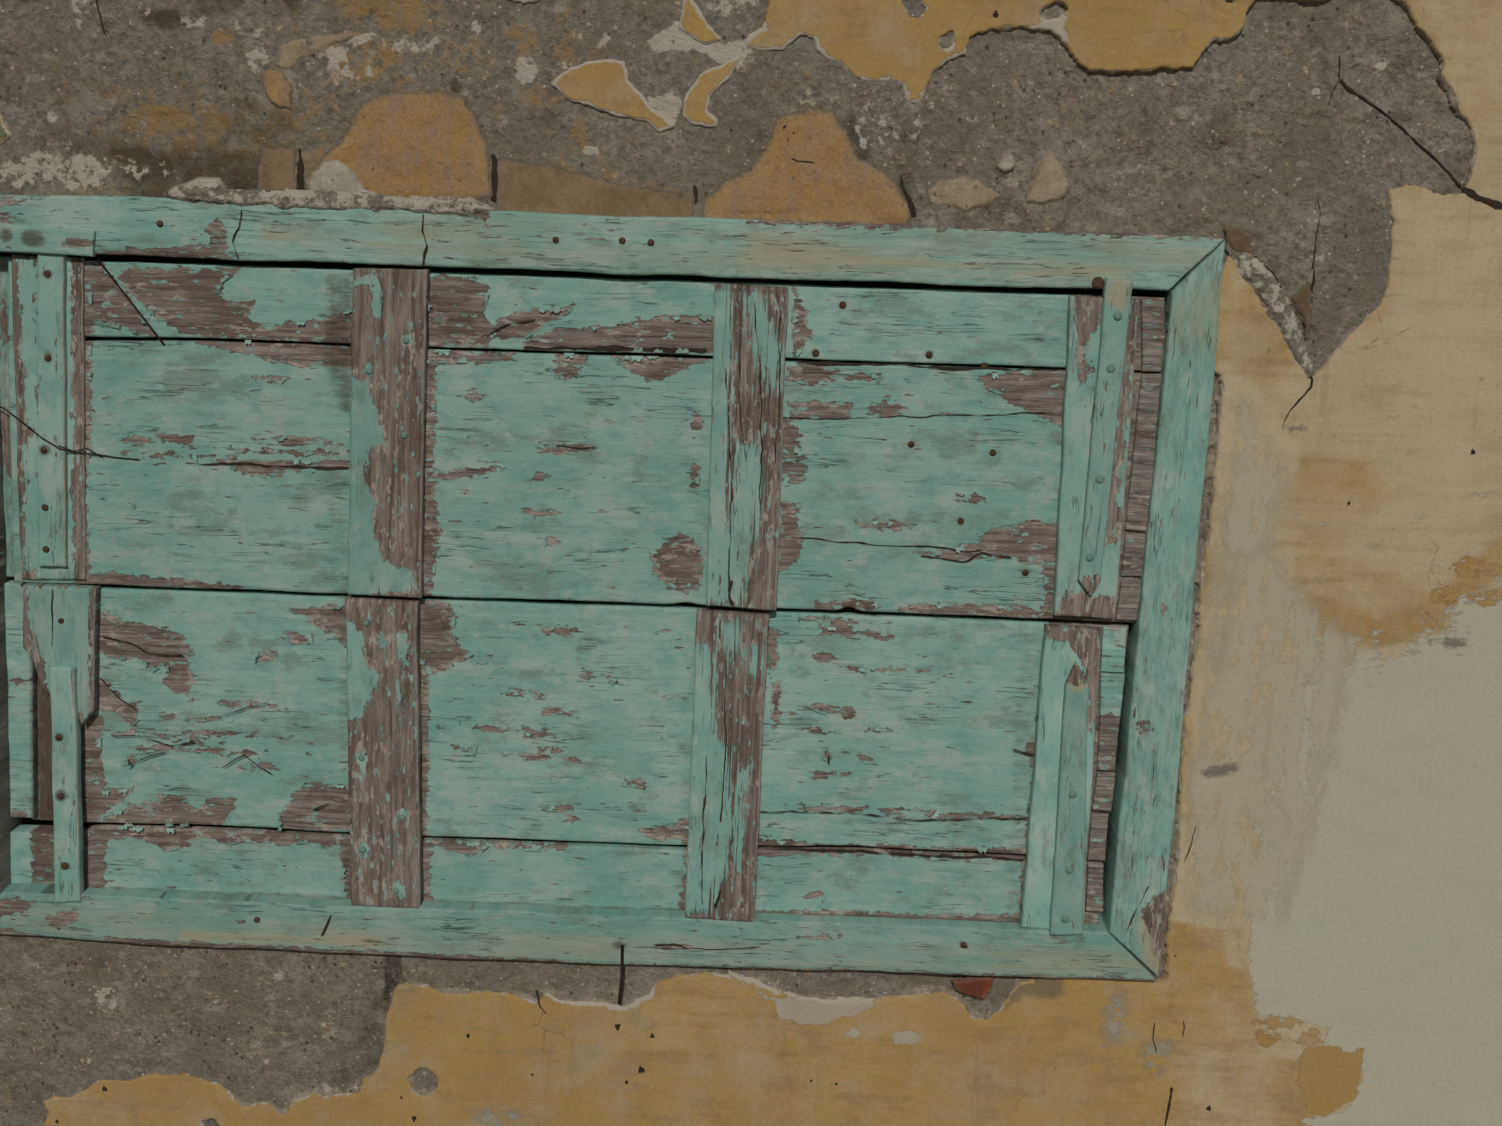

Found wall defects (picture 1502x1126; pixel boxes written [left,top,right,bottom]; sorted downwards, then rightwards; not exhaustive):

spalling [0,0,1472,377]
crack [1329,56,1502,209]
peeling [102,789,143,832]
peeling [1155,479,1502,1126]
spalling [0,934,1016,1126]